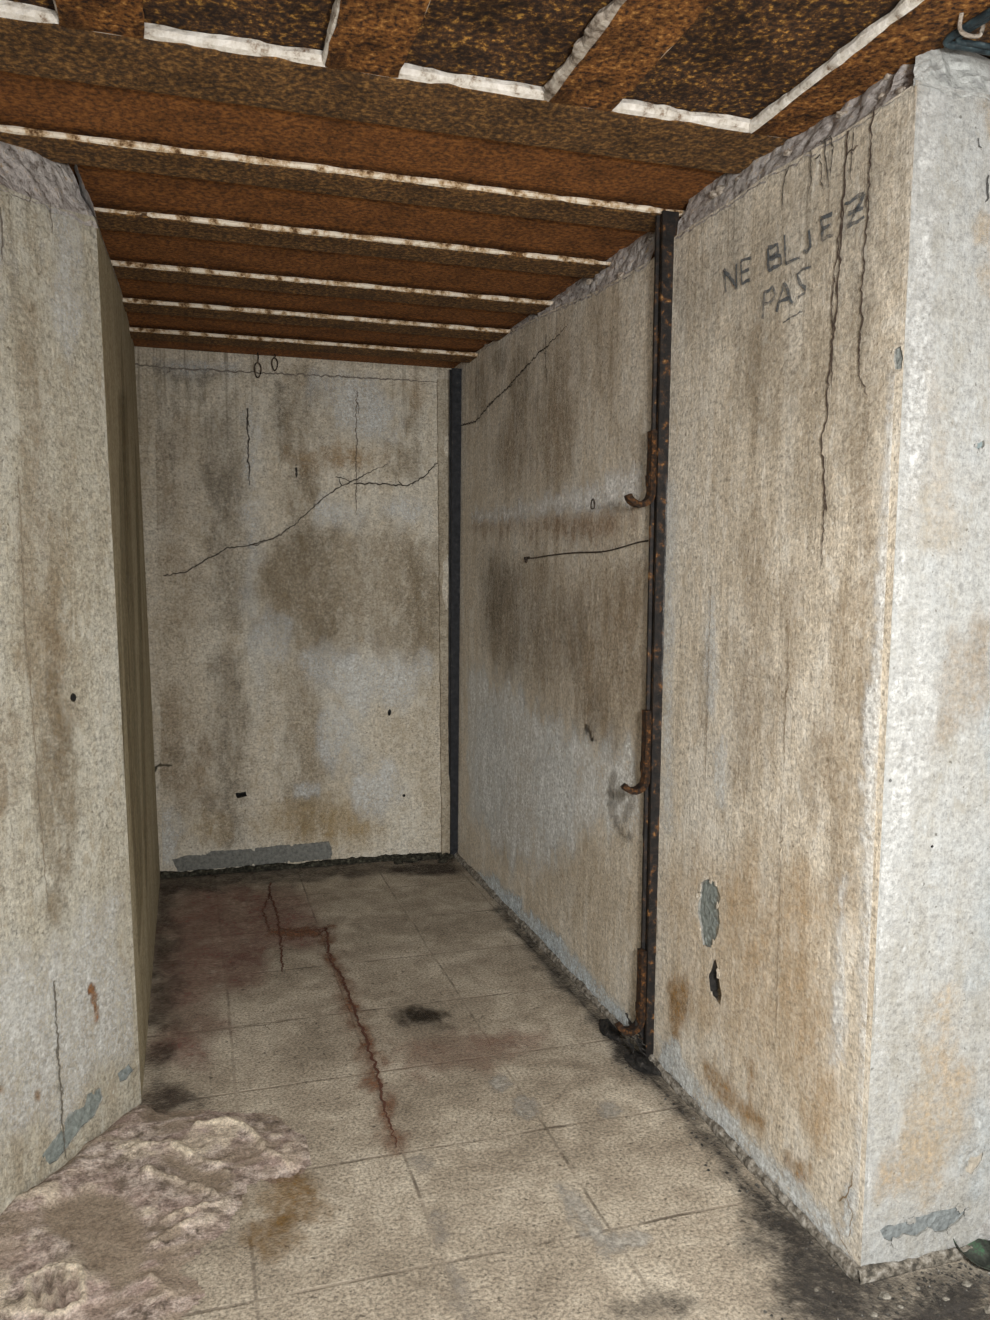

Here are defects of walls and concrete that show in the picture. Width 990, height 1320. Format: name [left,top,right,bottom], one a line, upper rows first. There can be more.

crack [135,363,438,576]
crack [460,324,568,426]
crack [781,107,875,565]
water stain [660,206,937,1248]
spalling [696,875,720,947]
peeling [42,1088,102,1169]
corrosion [269,925,402,1143]
peeling [880,1204,972,1249]